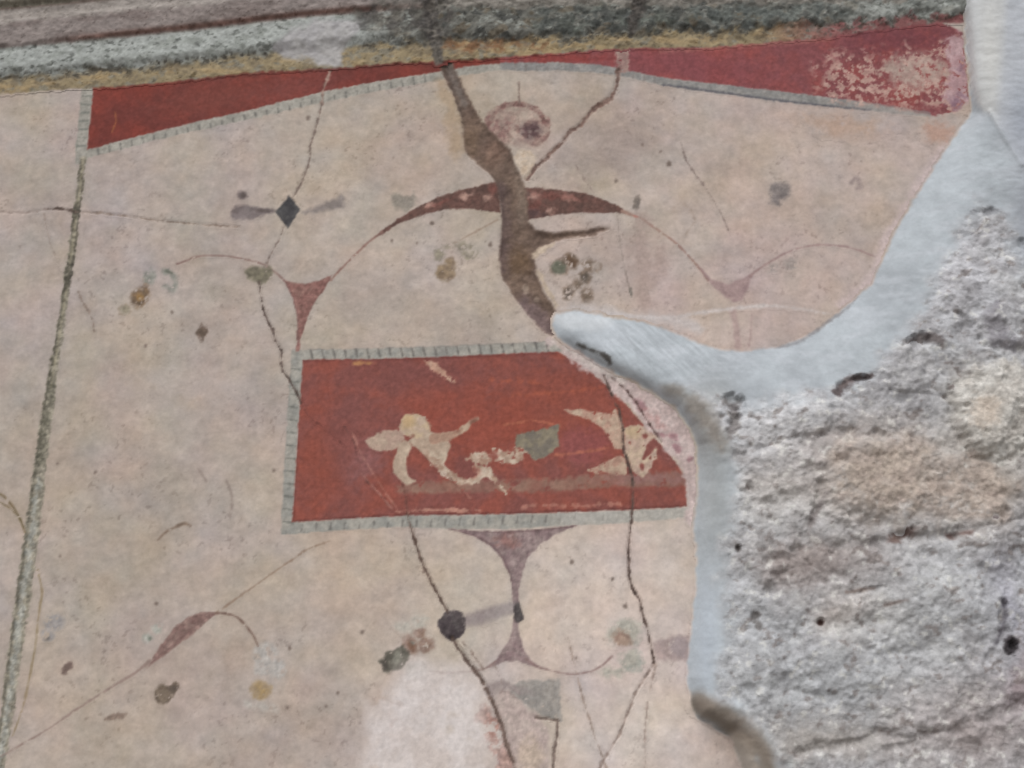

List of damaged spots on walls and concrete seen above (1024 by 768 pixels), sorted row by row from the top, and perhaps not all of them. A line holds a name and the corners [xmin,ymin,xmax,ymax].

crack [292,70,334,197]
crack [417,0,634,338]
peeling [612,50,633,75]
crack [623,0,652,41]
peeling [804,28,970,123]
crack [0,205,242,334]
crack [256,225,517,768]
crack [534,374,663,768]
spalling [543,335,696,530]
flaking render [714,211,1024,768]